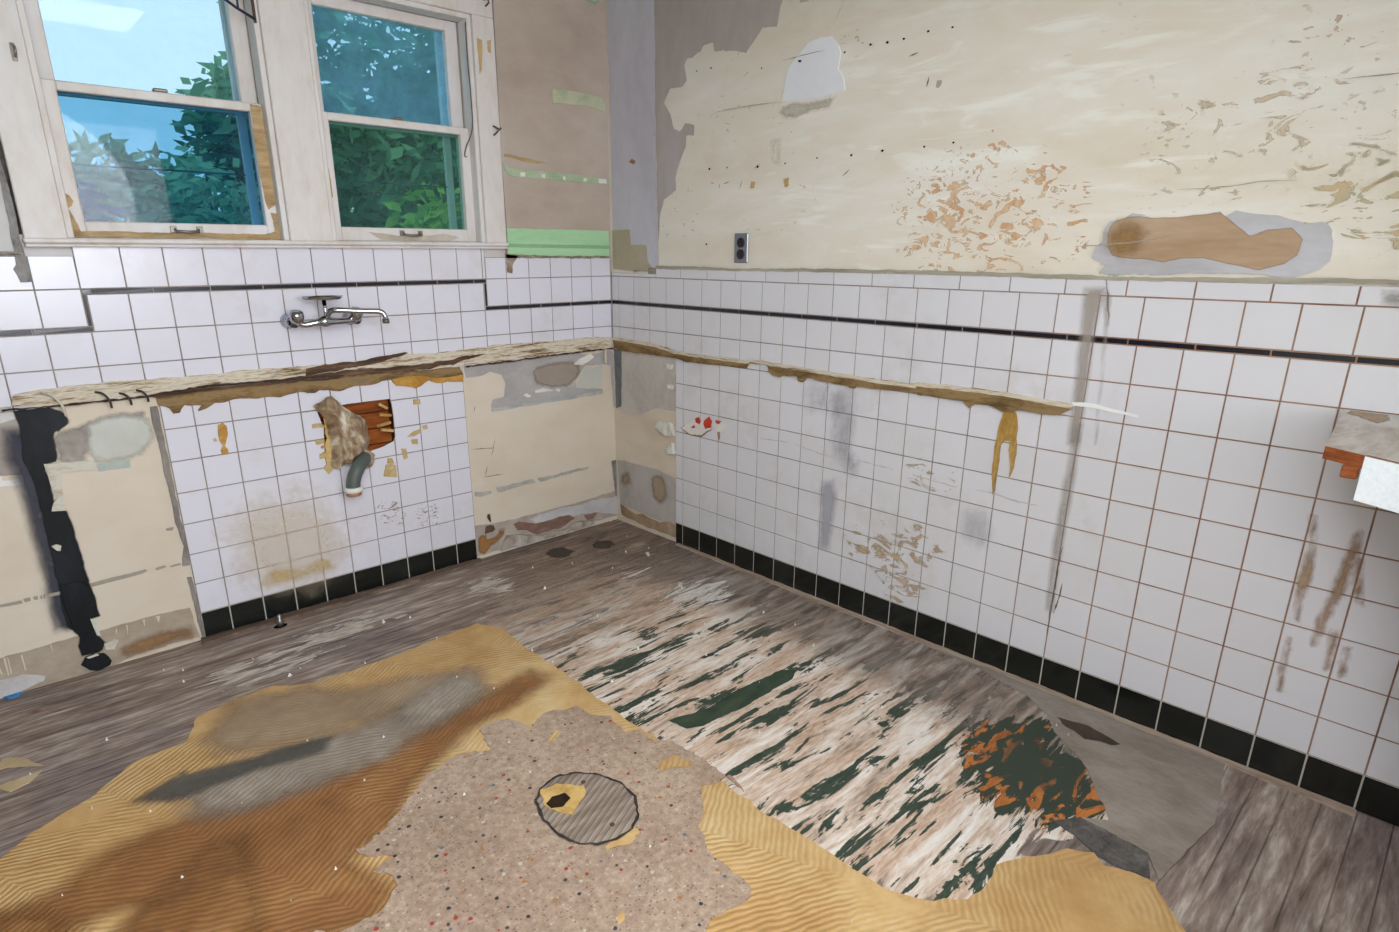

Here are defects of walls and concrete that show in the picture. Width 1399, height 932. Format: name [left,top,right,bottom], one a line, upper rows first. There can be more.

peeling [1157,100,1240,173]
peeling [1209,15,1399,250]
peeling [894,140,1089,272]
flaking render [0,412,15,423]
peeling [44,460,96,511]
flaking render [475,460,676,556]
flaking render [0,608,200,699]